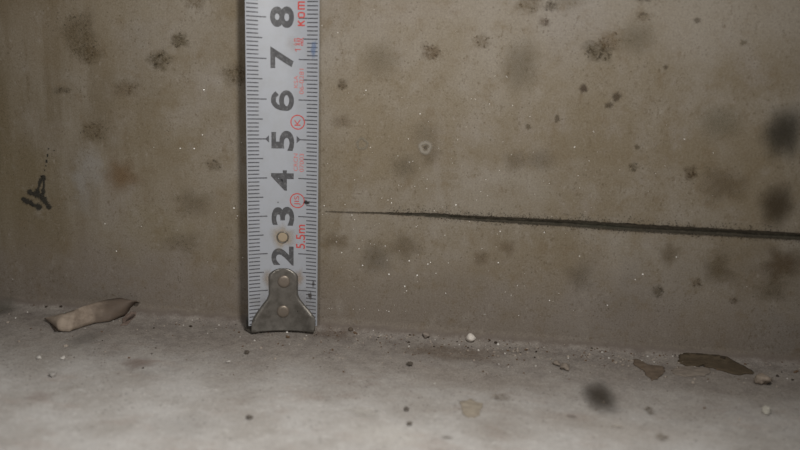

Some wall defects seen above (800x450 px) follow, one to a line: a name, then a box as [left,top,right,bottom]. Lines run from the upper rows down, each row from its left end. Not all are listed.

damp [770,118,796,147]
crack [325,205,800,243]